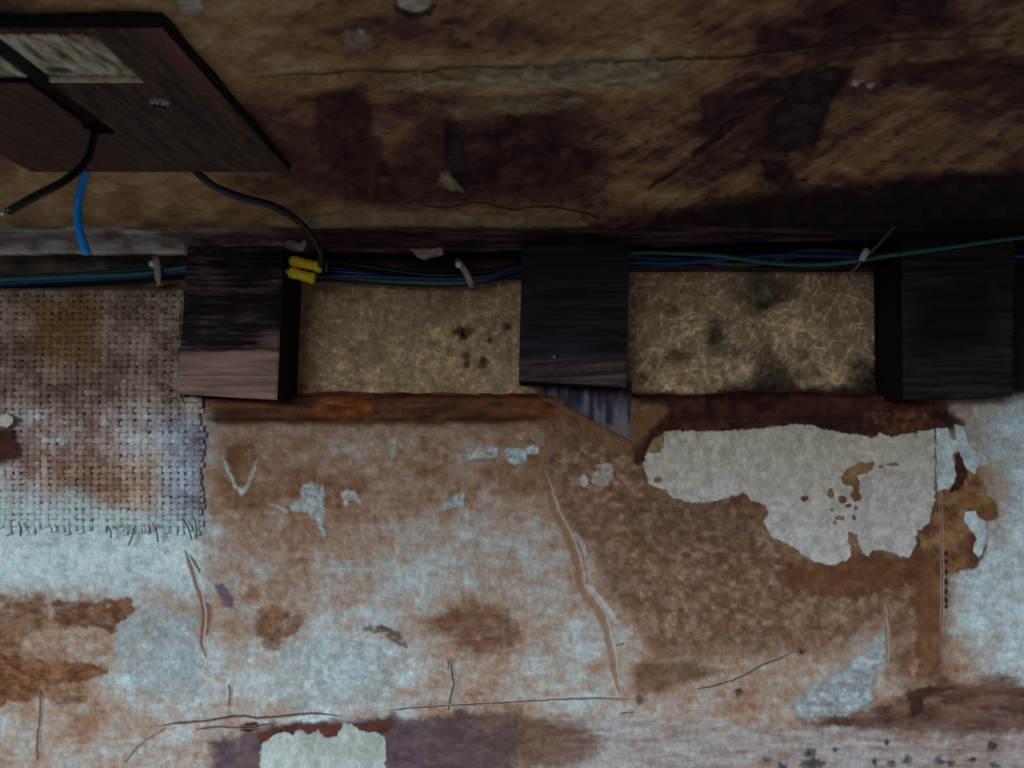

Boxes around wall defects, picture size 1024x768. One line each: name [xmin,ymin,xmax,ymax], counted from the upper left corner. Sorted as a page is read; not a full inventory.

damp [316,92,396,199]
damp [444,114,591,188]
damp [737,66,852,189]
damp [454,327,472,340]
peeling [643,424,981,565]
rust [919,472,998,578]
peeling [964,511,988,557]
crack [184,550,213,658]
crack [125,684,342,762]
peeling [259,723,387,768]
crack [379,659,635,715]
peeling [795,602,890,718]